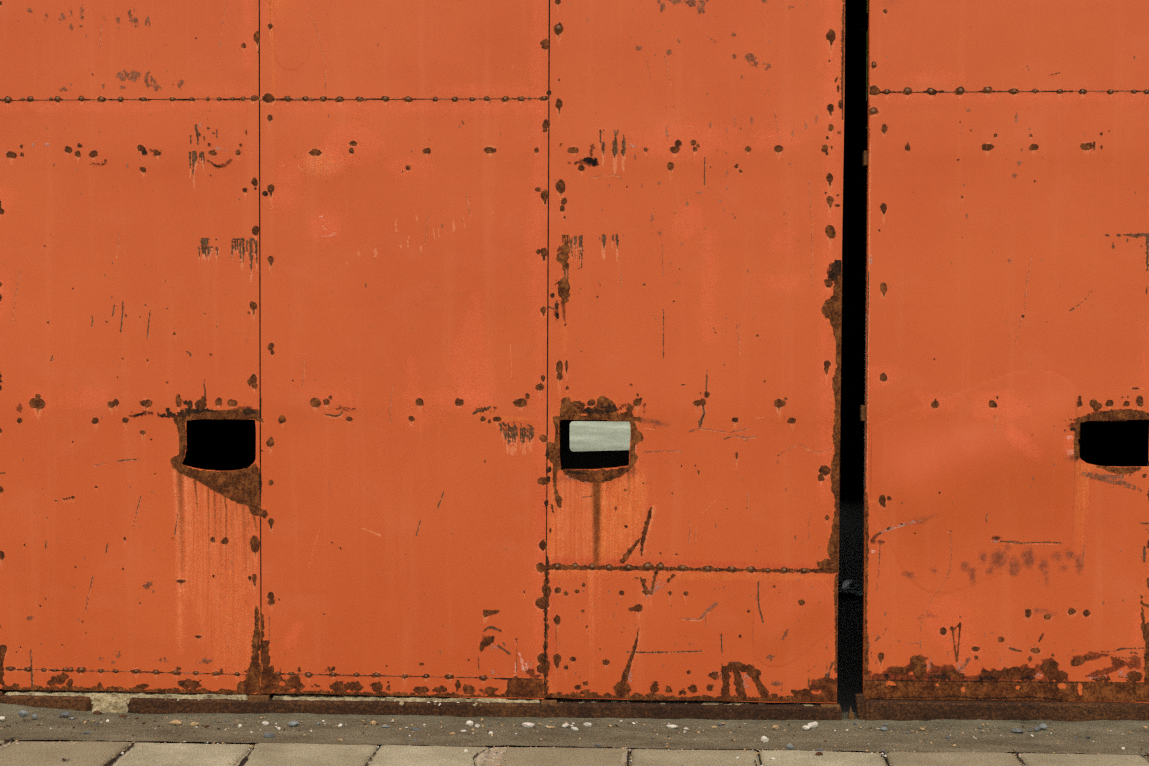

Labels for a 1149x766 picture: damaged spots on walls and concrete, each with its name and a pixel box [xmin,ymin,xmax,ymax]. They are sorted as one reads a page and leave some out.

corrosion [0,260,842,702]
corrosion [864,256,1149,702]